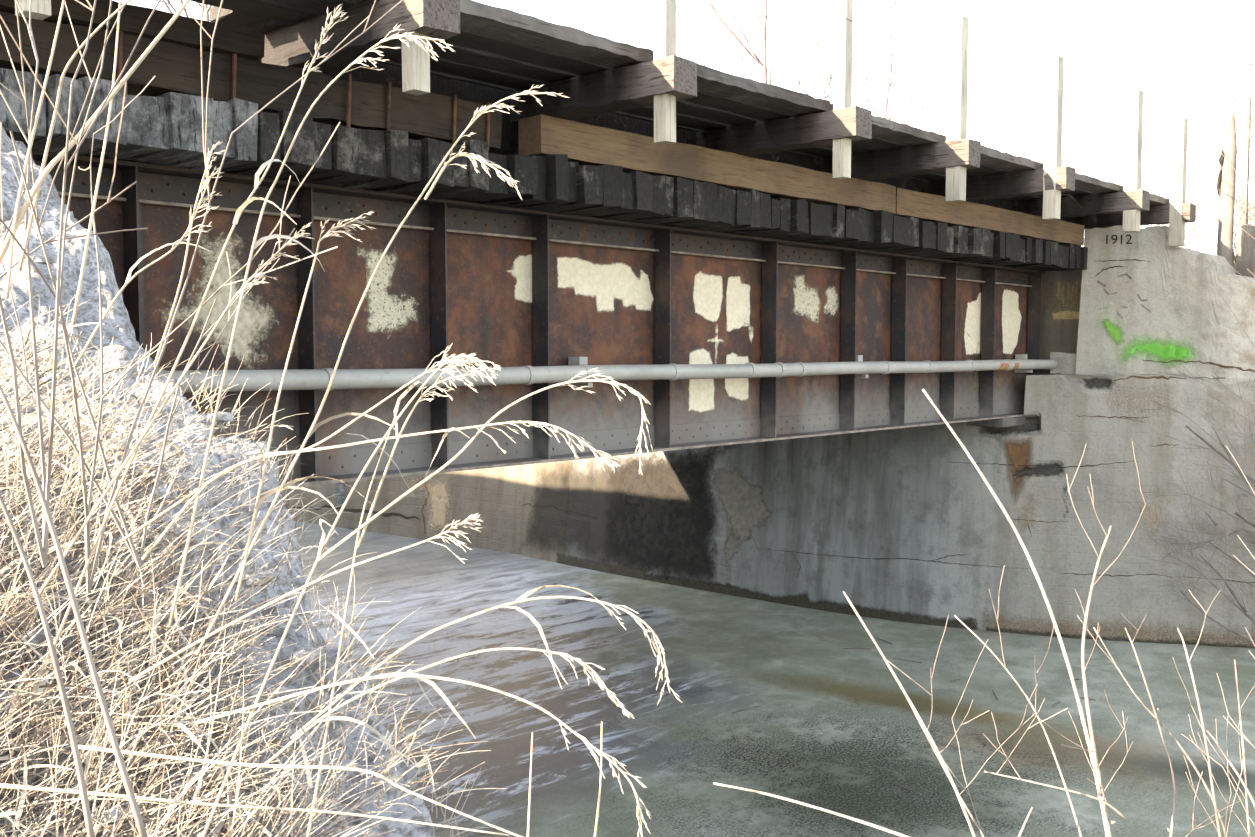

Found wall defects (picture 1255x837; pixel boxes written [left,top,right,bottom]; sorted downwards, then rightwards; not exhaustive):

crack [1114,359,1255,381]
corrosion [1004,441,1031,496]
crack [288,479,430,534]
damp [557,455,1255,648]